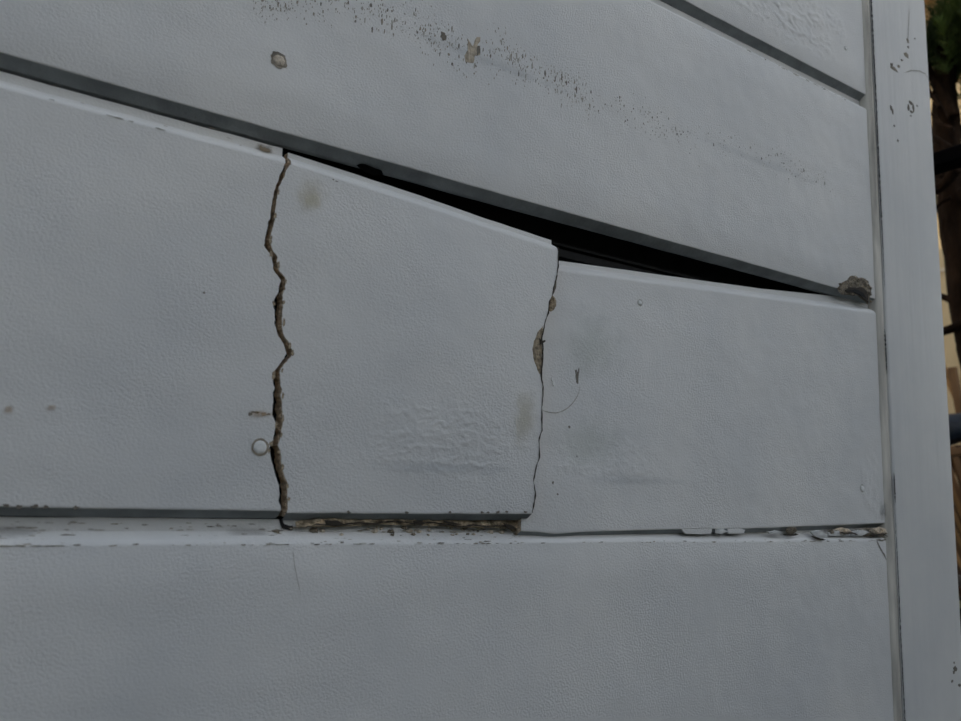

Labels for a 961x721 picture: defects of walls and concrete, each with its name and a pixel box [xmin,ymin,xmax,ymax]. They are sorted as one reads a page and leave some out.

peeling [253,0,805,180]
crack [264,153,301,594]
crack [515,247,580,534]
spalling [837,275,872,304]
spalling [251,510,527,545]